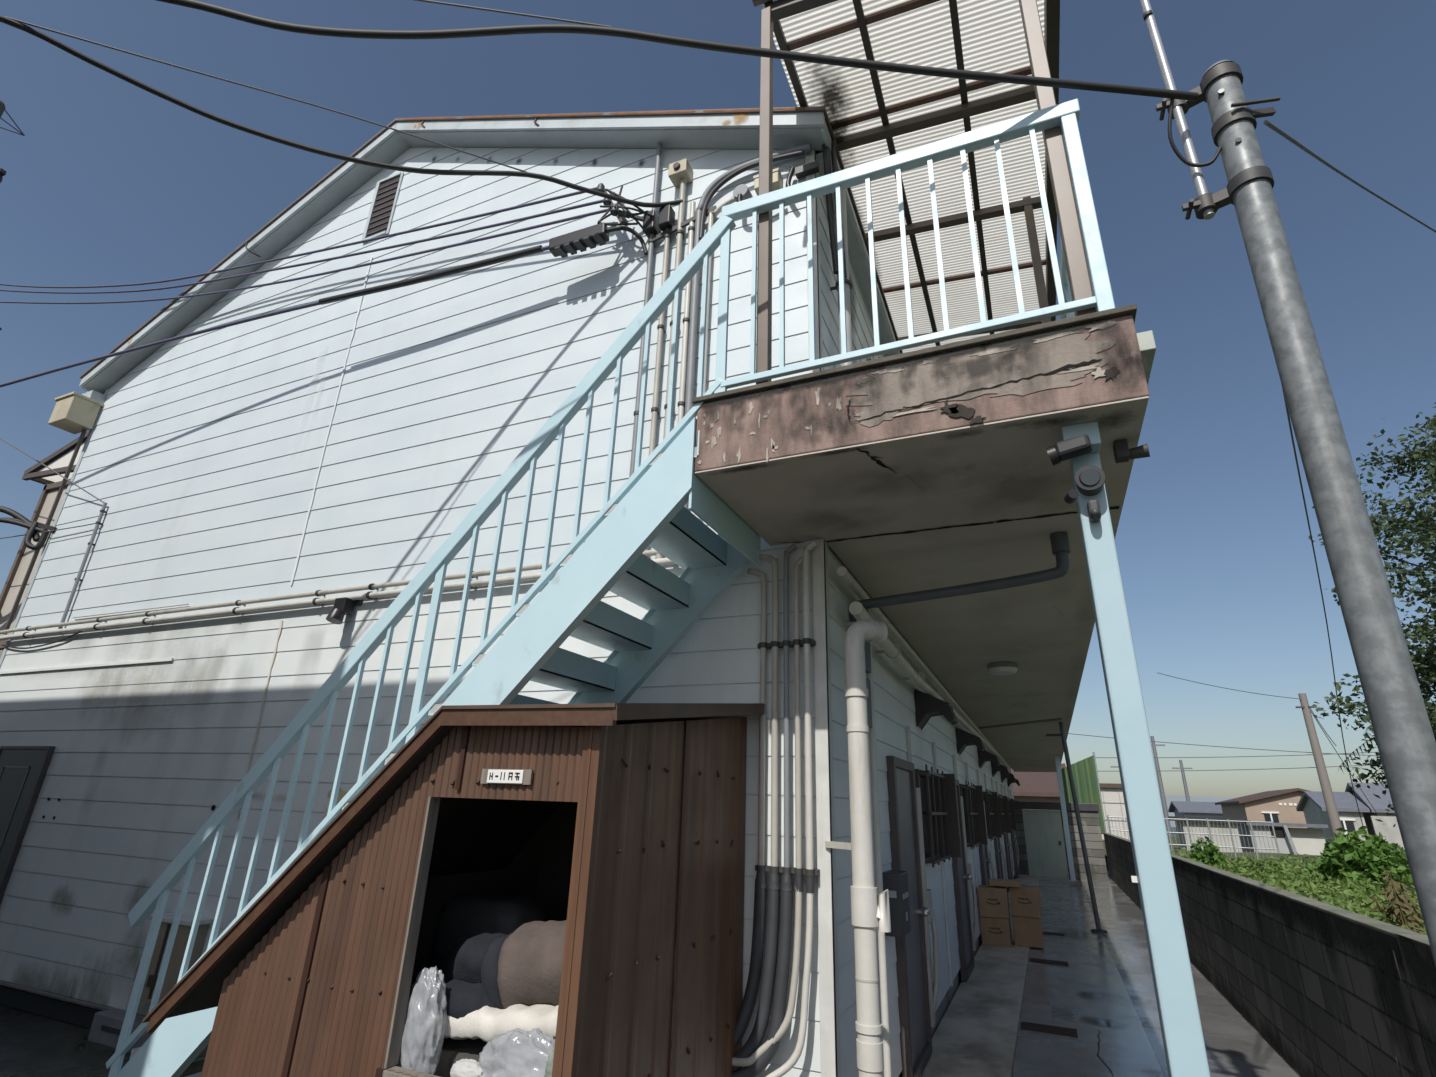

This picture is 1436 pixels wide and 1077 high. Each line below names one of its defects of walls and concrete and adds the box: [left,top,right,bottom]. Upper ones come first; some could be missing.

peeling [815,321,1120,427]
peeling [697,402,778,464]
crack [1097,1031,1113,1076]